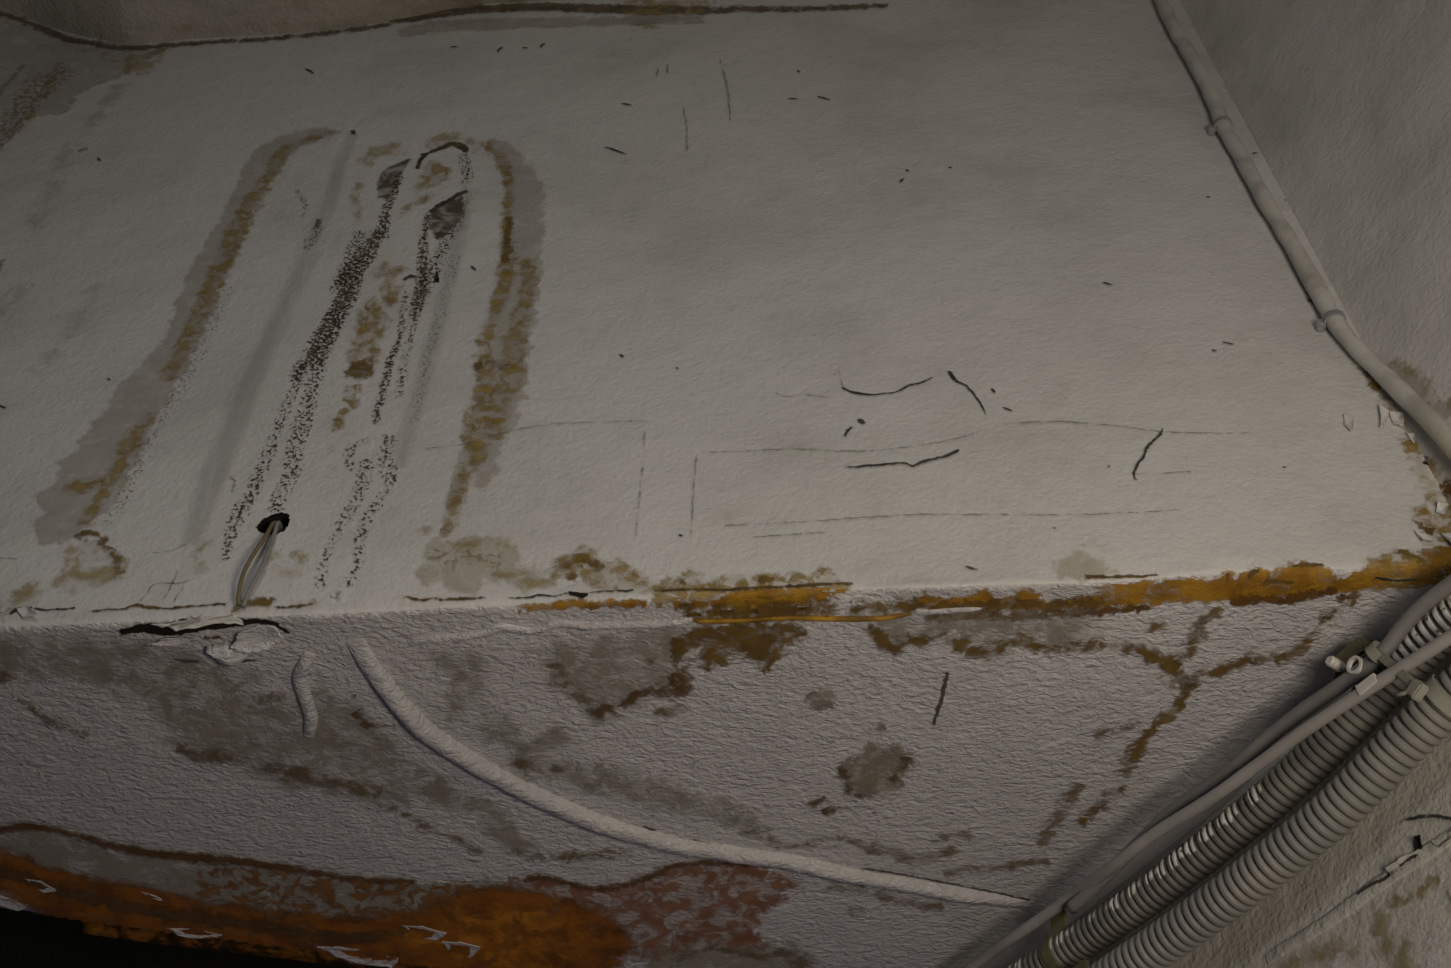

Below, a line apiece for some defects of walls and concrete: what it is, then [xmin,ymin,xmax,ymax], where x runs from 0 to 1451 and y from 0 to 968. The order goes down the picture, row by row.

water stain [0,0,889,149]
water stain [36,128,330,586]
water stain [199,133,549,590]
crack [764,370,986,468]
crack [1024,421,1197,515]
peeling [119,614,291,654]
water stain [231,597,277,613]
rust [518,368,1451,845]
water stain [808,724,913,816]
rust [0,822,797,968]